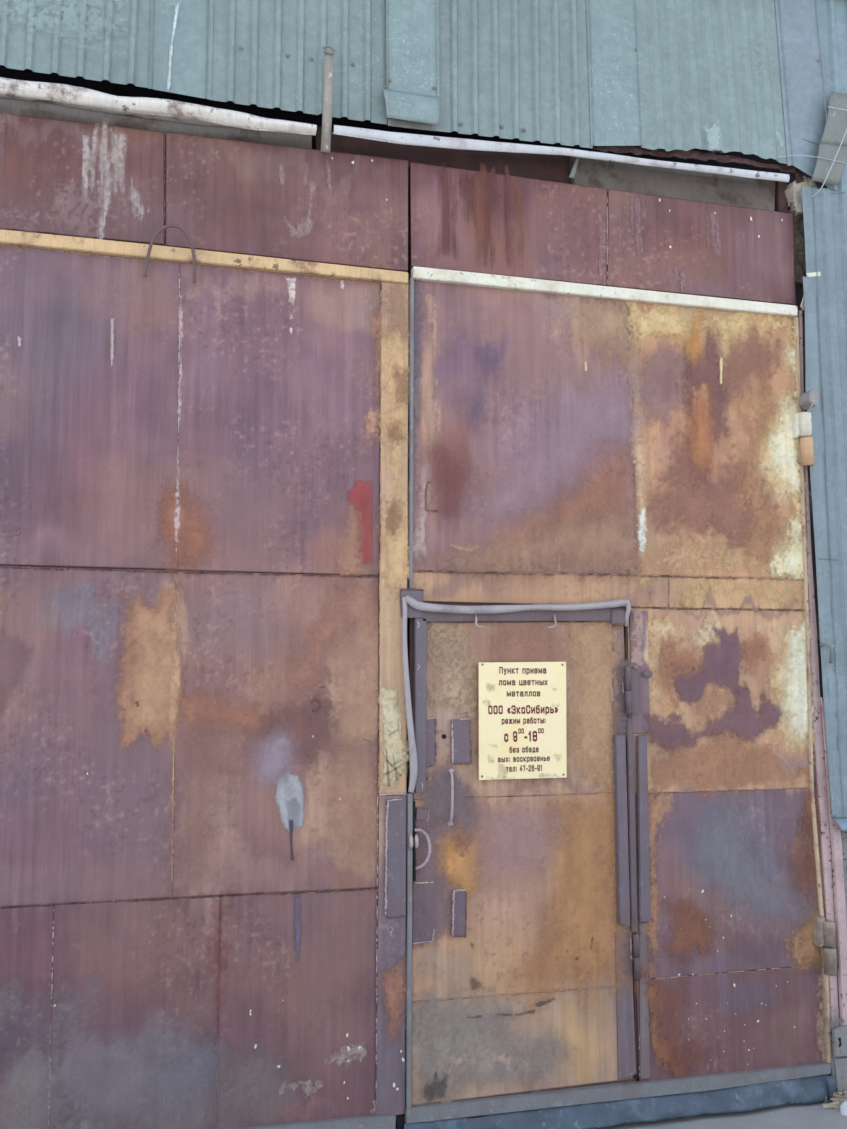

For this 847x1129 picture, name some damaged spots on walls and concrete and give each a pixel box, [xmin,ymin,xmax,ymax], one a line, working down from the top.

rust [442,163,510,264]
rust [366,409,403,441]
rust [639,315,779,440]
rust [387,504,402,535]
rust [117,588,182,748]
rust [646,632,782,751]
rust [437,828,479,894]
rust [528,796,624,1008]
rust [644,791,677,1078]
rust [785,791,825,969]